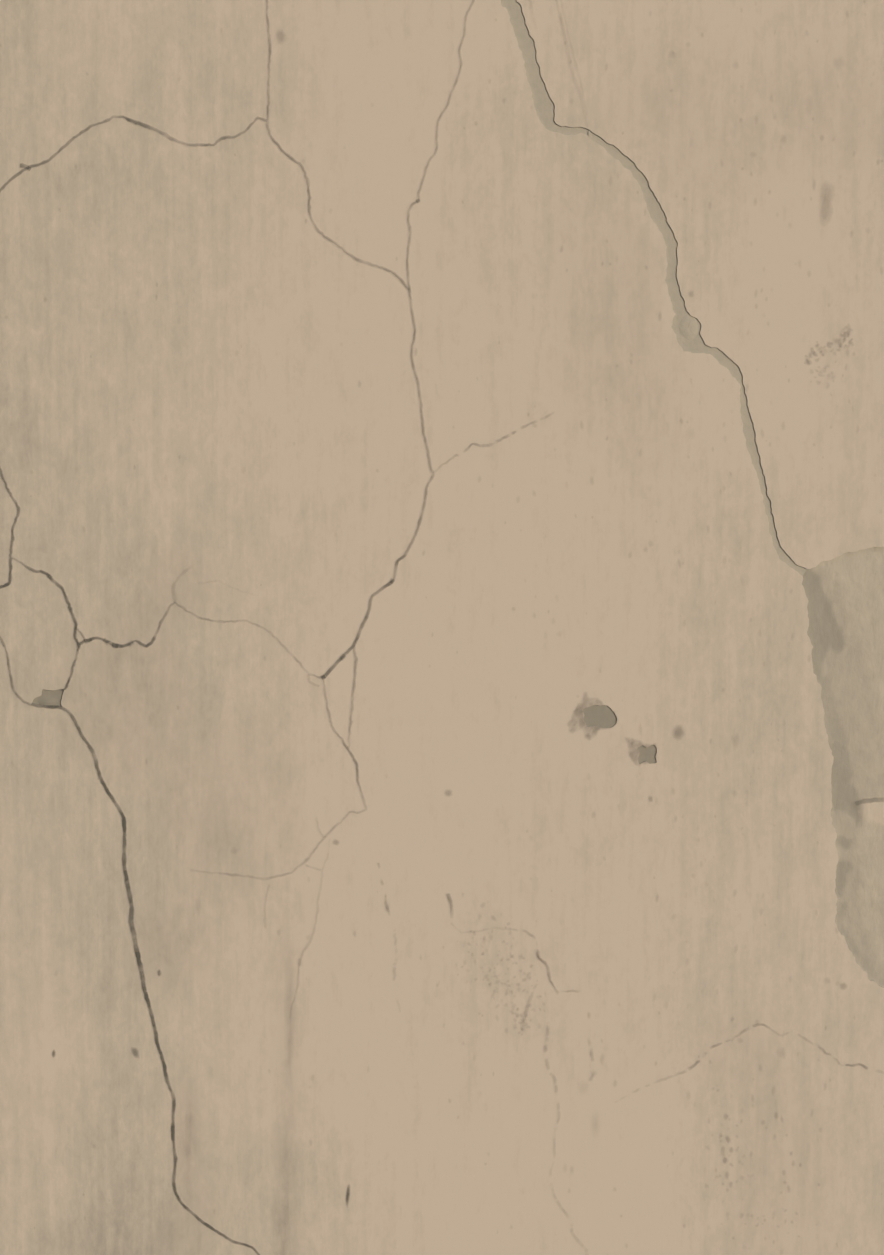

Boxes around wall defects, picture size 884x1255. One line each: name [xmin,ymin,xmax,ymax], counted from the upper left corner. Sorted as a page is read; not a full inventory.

crack [501,0,807,576]
crack [0,483,154,649]
crack [46,678,255,1251]
spalling [583,705,617,728]
spalling [638,745,657,764]
spalling [802,547,884,988]